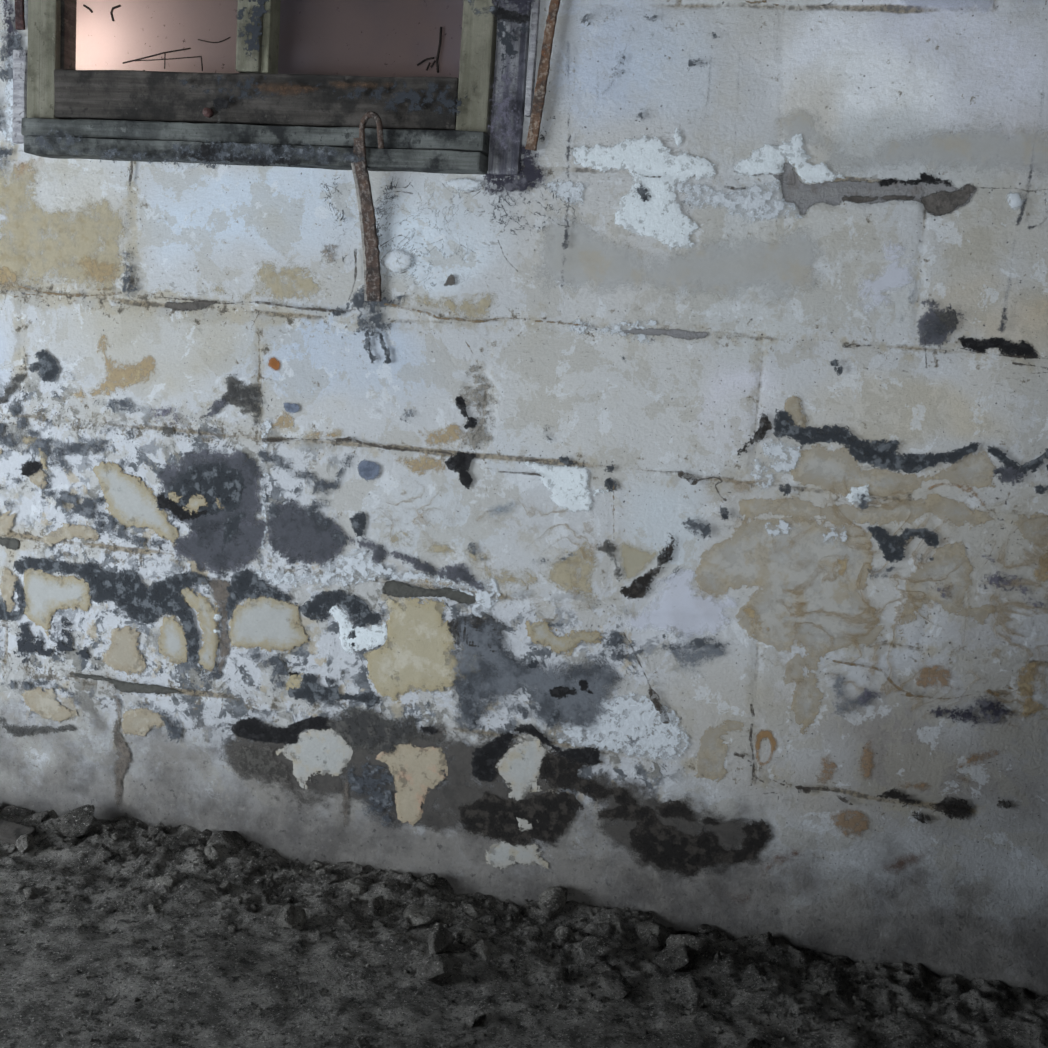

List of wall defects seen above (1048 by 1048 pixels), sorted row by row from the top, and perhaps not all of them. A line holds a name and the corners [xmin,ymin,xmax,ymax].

corrosion [525,0,560,151]
peeling [571,127,977,250]
crack [1,283,115,298]
crack [162,251,357,367]
crack [384,304,578,352]
damp [831,359,844,375]
damp [0,335,771,879]
damp [540,409,1048,734]
damp [755,730,776,765]
damp [877,788,972,824]